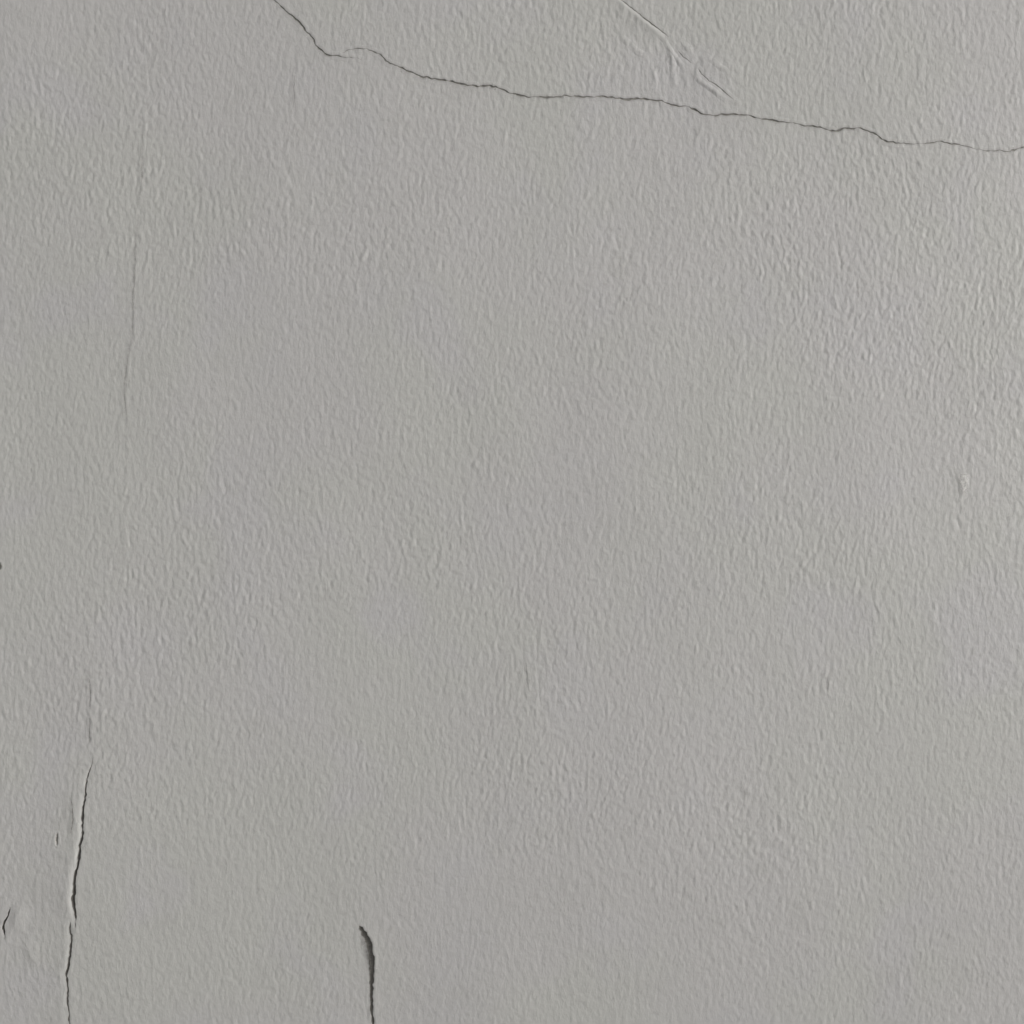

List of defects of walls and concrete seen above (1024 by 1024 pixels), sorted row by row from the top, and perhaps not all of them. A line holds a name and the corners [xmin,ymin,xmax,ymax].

crack [268,0,1024,156]
crack [62,666,98,1024]